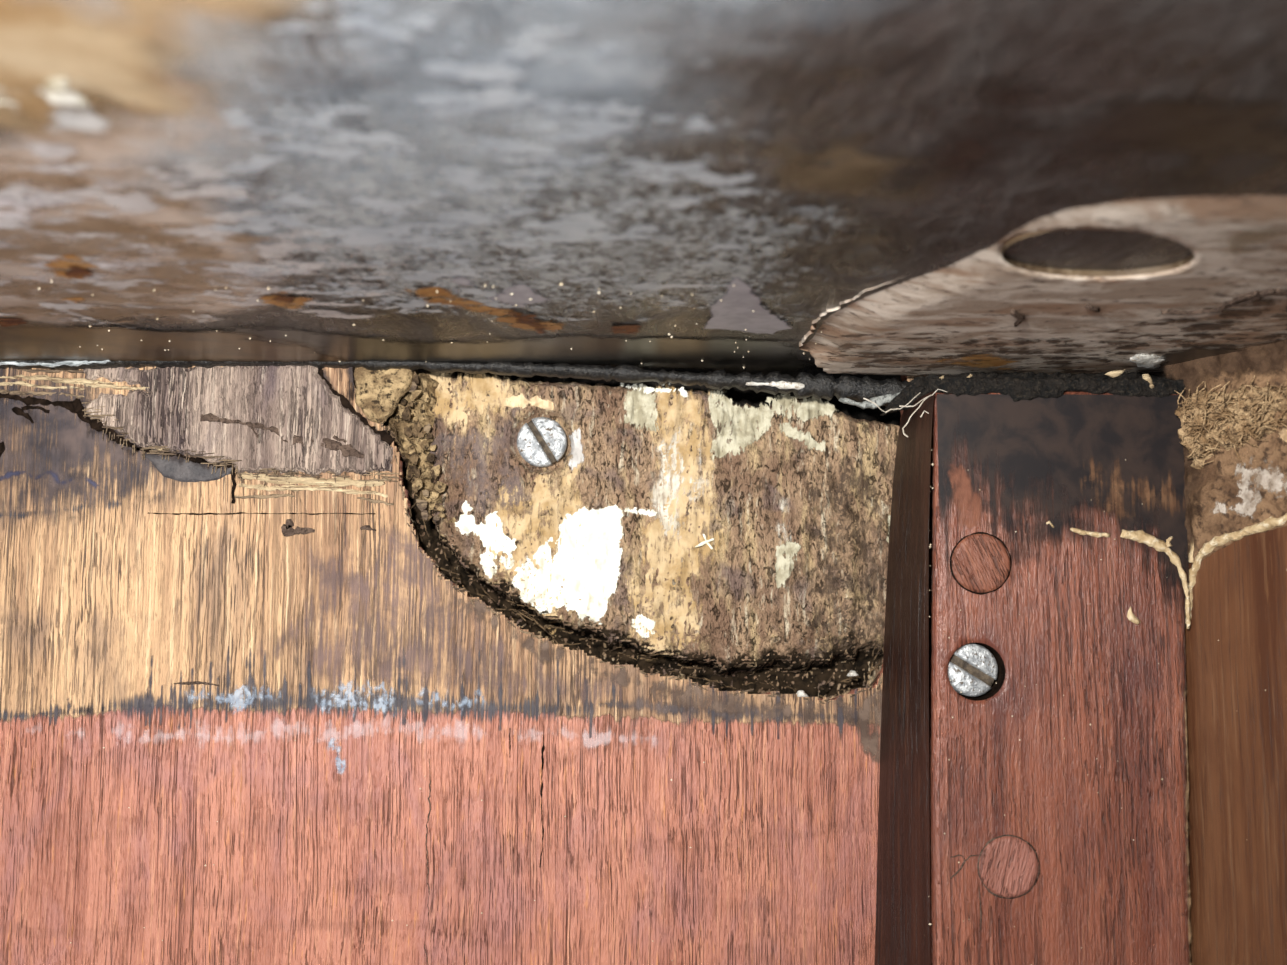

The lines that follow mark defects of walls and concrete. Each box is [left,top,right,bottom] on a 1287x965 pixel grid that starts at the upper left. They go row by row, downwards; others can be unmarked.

peeling [269,1,435,56]
peeling [0,26,778,326]
water stain [0,456,888,762]
peeling [0,195,1287,727]
water stain [937,394,1189,599]